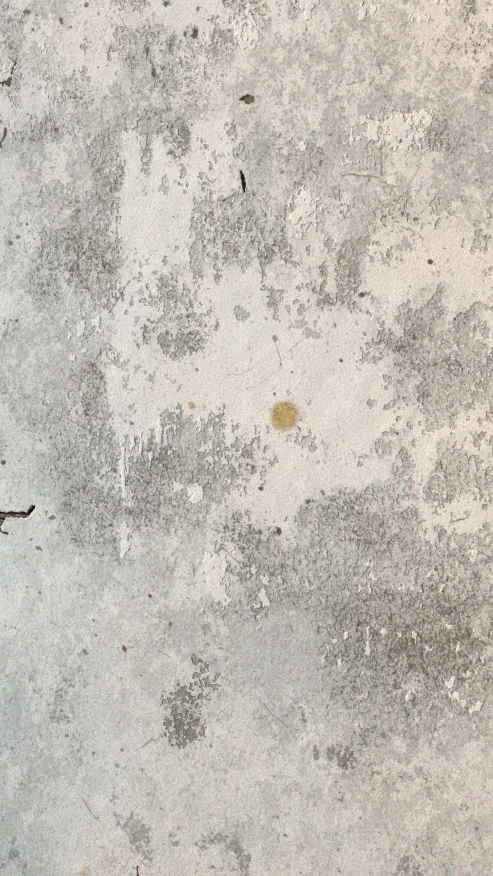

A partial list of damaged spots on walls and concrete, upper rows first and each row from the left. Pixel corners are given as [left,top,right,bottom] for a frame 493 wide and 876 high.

corrosion [272,402,298,429]